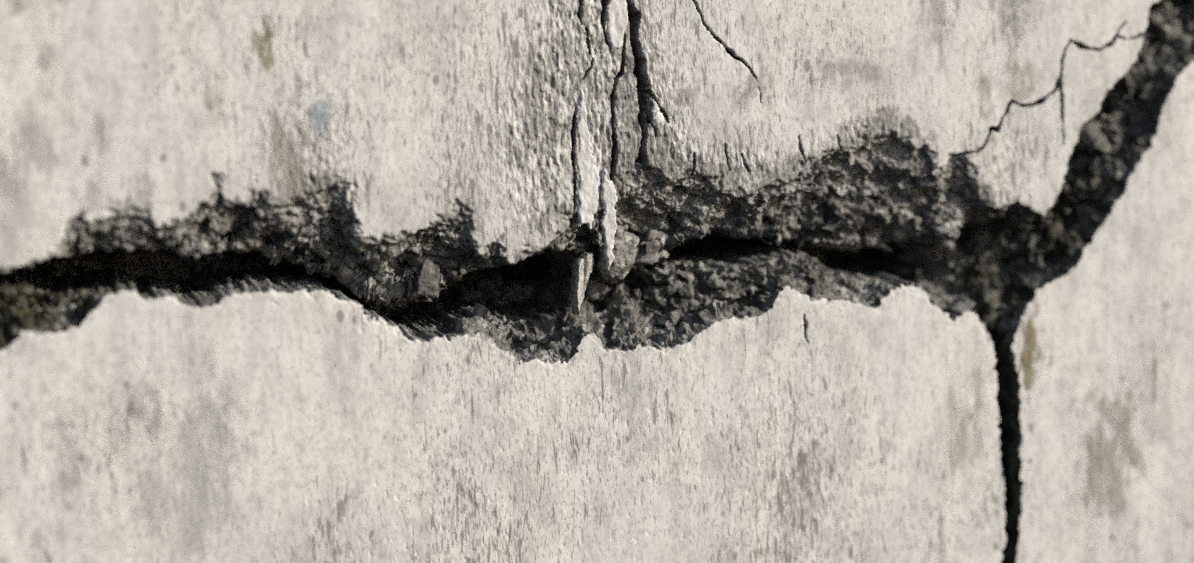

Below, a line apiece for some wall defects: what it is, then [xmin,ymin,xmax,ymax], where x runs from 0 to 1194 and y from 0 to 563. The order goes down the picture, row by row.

crack [569,107,577,218]
spalling [0,267,125,351]
spalling [61,187,514,303]
crack [0,235,577,342]
spalling [438,90,1044,364]
crack [576,0,1194,563]